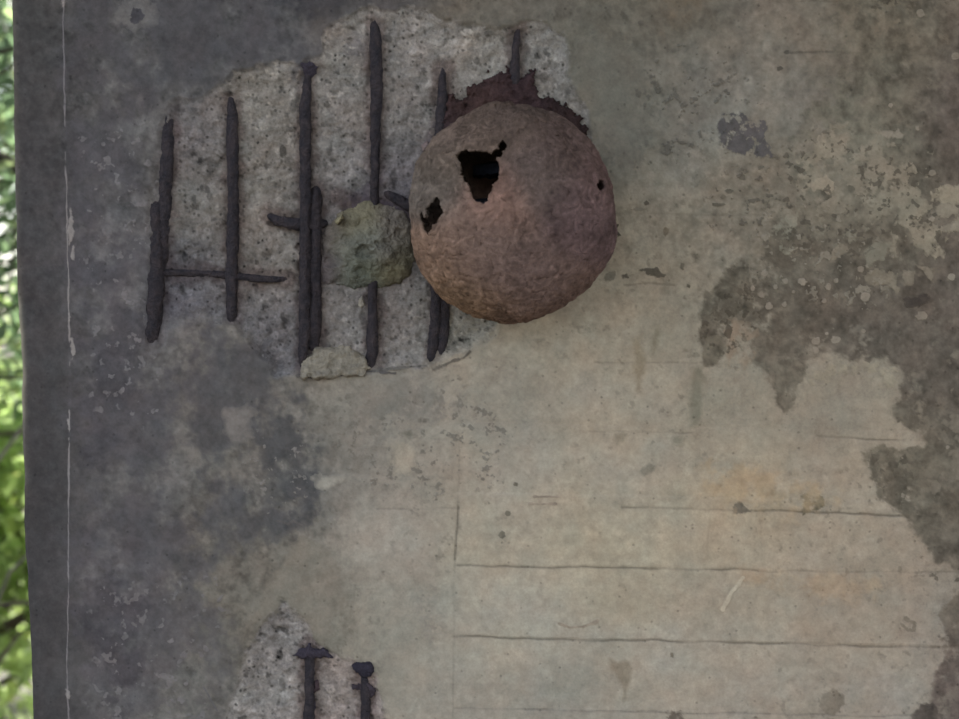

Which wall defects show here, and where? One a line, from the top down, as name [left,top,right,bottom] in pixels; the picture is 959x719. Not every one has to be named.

rust [300,61,318,78]
spalling [137,7,575,503]
leakage [760,120,959,294]
spalling [222,604,395,719]
rust [292,643,333,659]
rust [352,661,376,698]